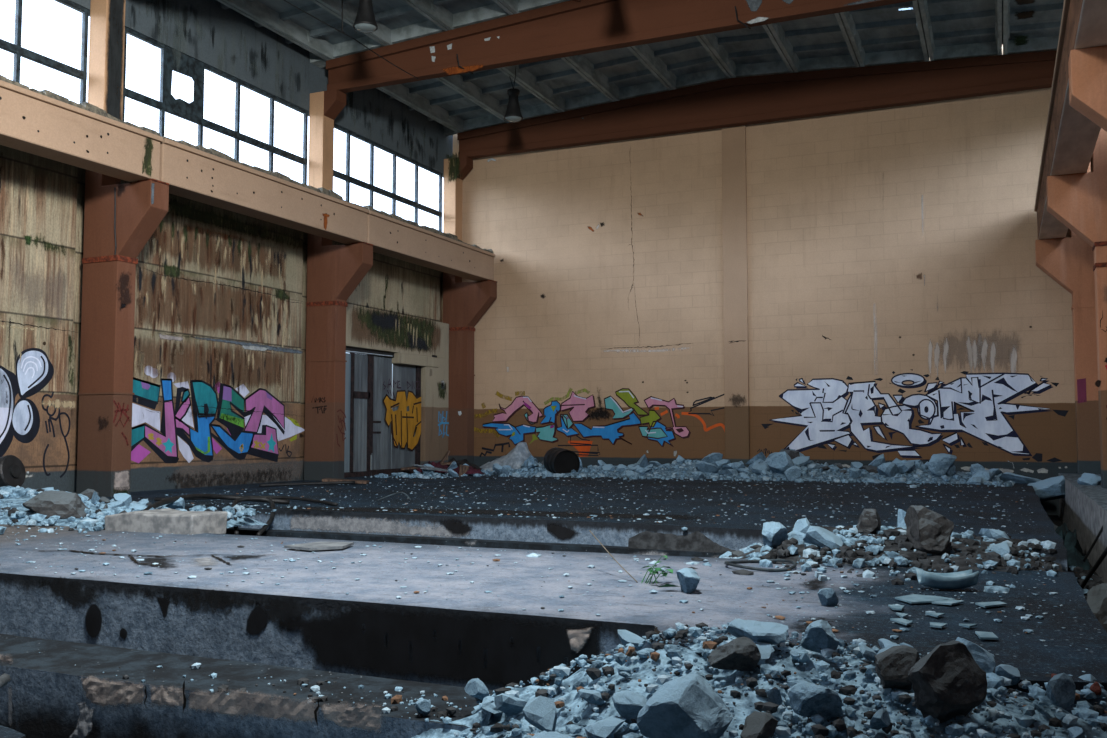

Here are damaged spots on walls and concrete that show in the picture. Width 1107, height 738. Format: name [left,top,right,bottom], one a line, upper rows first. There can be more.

peeling [746,0,768,24]
crack [609,148,691,349]
water stain [133,222,290,400]
water stain [928,338,949,371]
water stain [967,336,996,372]